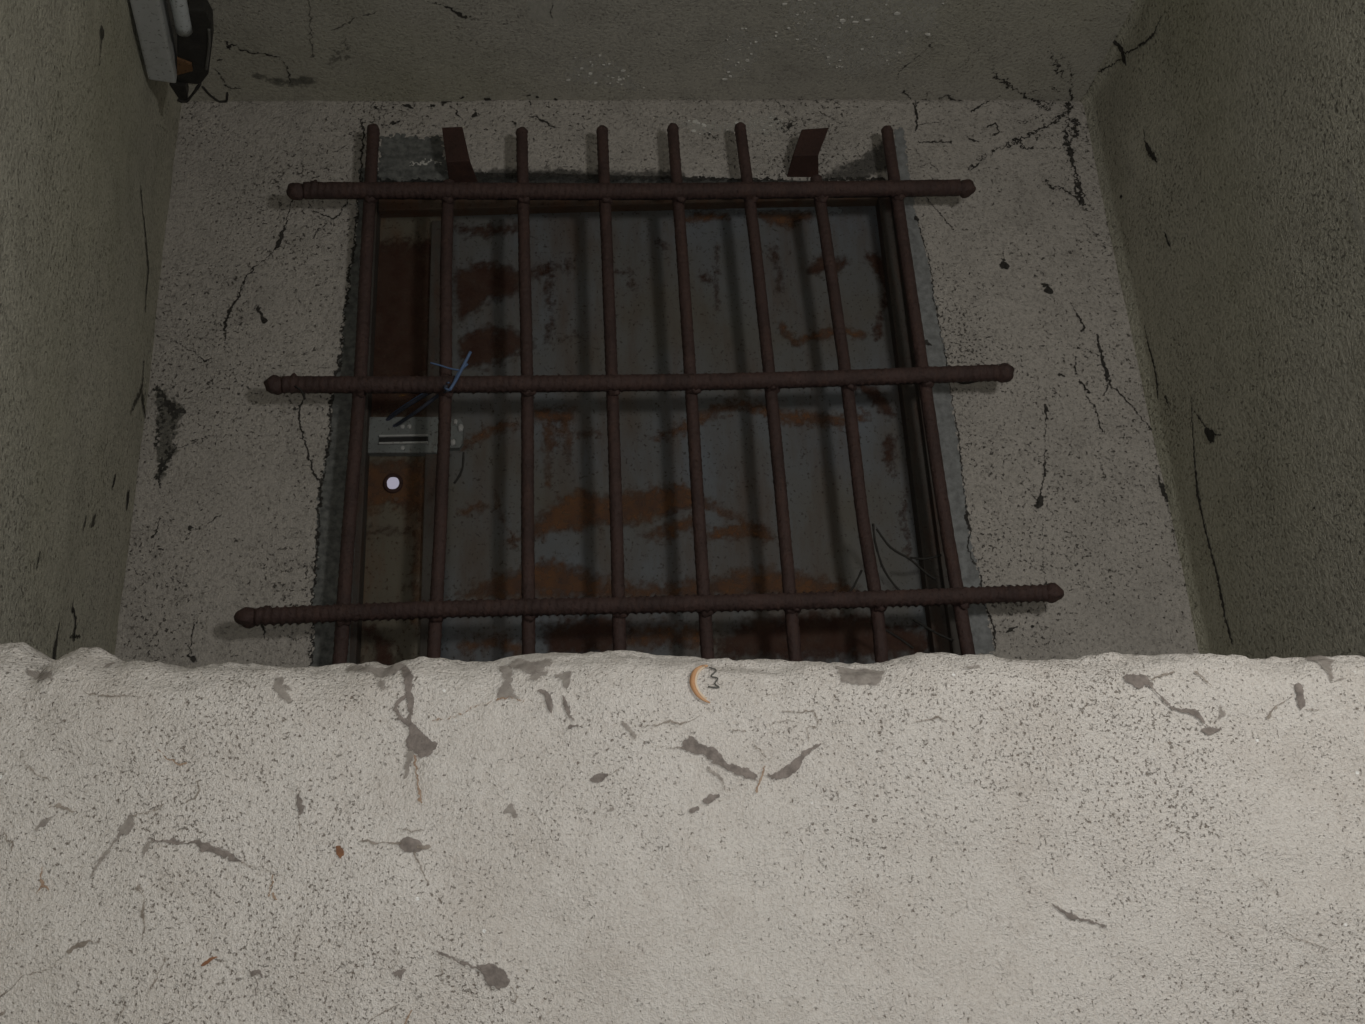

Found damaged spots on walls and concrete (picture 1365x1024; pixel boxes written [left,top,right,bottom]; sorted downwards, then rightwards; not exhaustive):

crack [1087,15,1162,93]
corrosion [454,261,519,320]
corrosion [367,457,425,511]
corrosion [518,484,768,540]
crack [1052,302,1232,644]
corrosion [362,624,394,665]
crack [782,710,819,739]